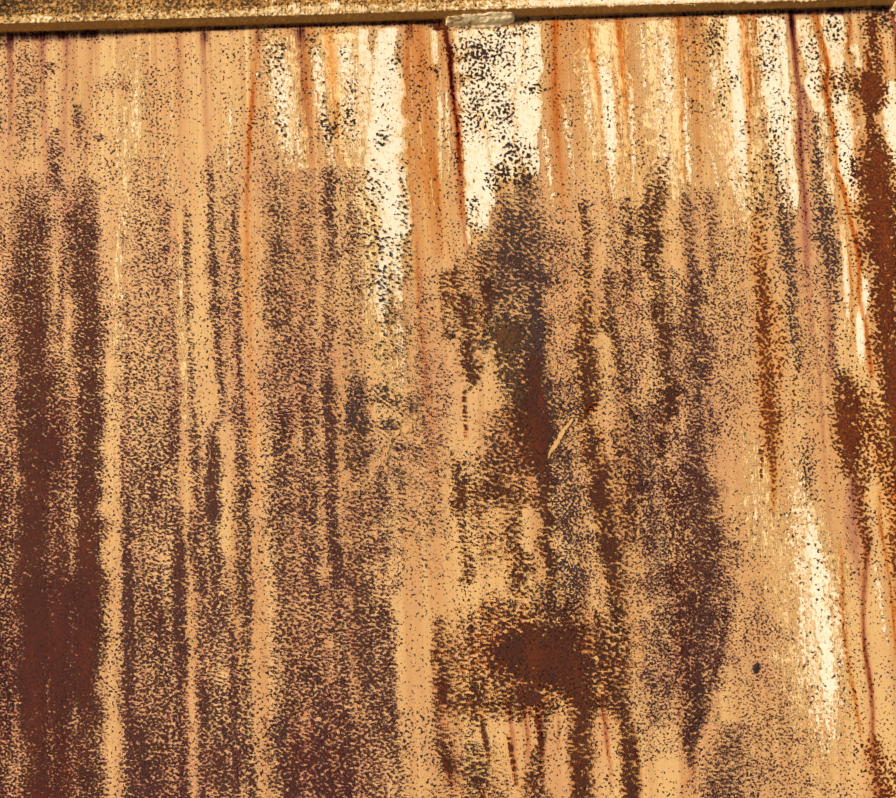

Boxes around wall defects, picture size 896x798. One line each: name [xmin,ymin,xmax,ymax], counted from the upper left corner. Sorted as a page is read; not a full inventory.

corrosion [553,11,729,69]
corrosion [317,72,397,160]
corrosion [717,70,738,118]
corrosion [861,733,896,798]